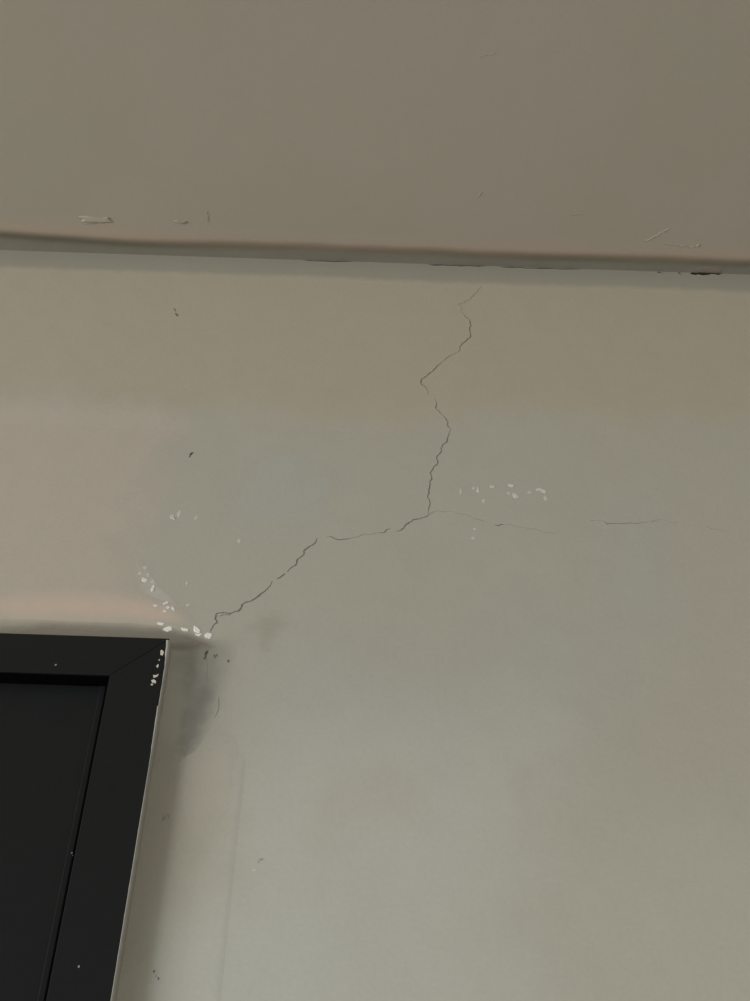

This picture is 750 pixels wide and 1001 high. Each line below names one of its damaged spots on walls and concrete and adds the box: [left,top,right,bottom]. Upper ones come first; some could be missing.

flaking render [135,559,230,663]
crack [209,264,580,633]